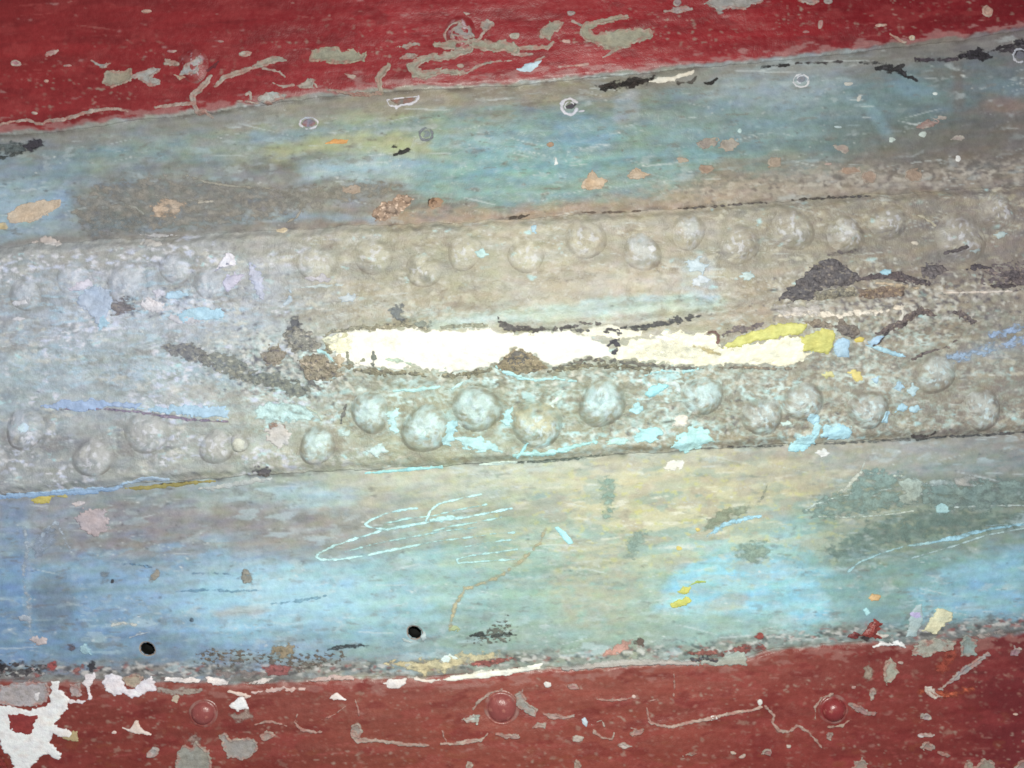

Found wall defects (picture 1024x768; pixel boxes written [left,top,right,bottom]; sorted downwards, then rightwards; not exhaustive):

peeling [663,0,763,14]
peeling [90,50,219,89]
peeling [236,78,318,106]
peeling [309,46,367,79]
peeling [397,11,653,80]
peeling [774,245,1024,362]
peeling [260,322,702,414]
peeling [0,665,354,768]
peeling [383,651,644,749]
peeling [561,651,747,690]
peeling [826,604,1005,741]
peeling [917,733,950,758]